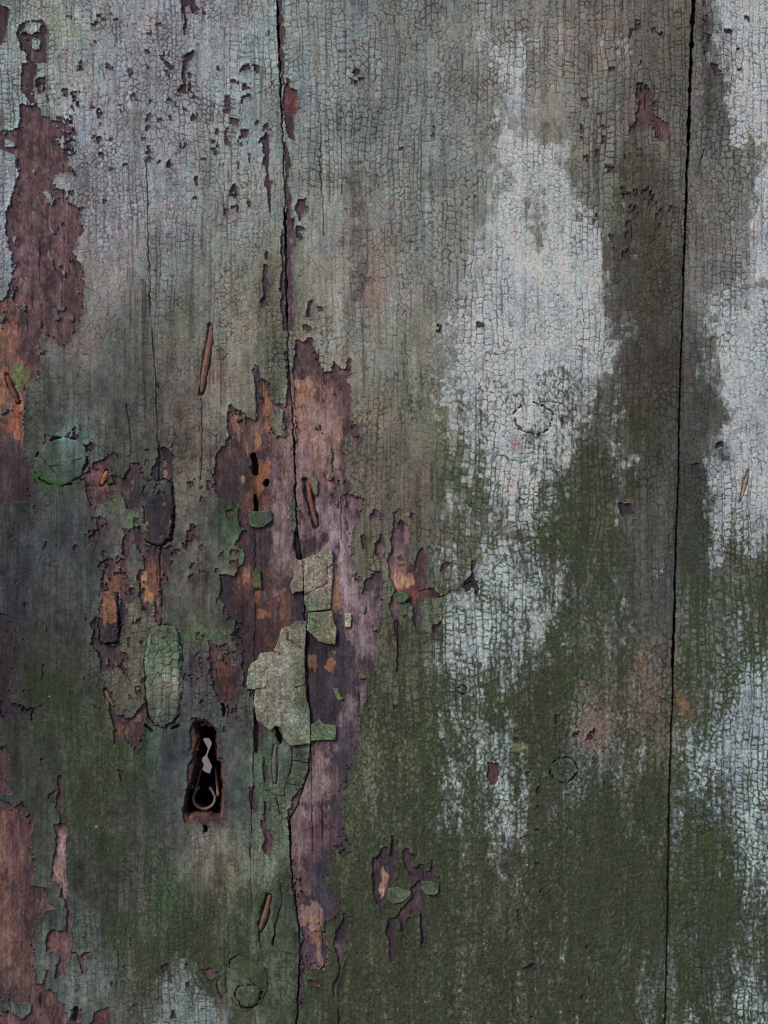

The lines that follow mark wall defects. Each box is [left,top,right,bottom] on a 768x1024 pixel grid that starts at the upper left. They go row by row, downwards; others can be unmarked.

peeling [0,614,39,720]
peeling [0,747,110,1024]
peeling [0,5,113,508]
peeling [45,0,453,1010]
peeling [464,561,495,599]
water stain [425,30,647,858]
peeling [629,82,670,140]
water stain [671,601,768,1024]